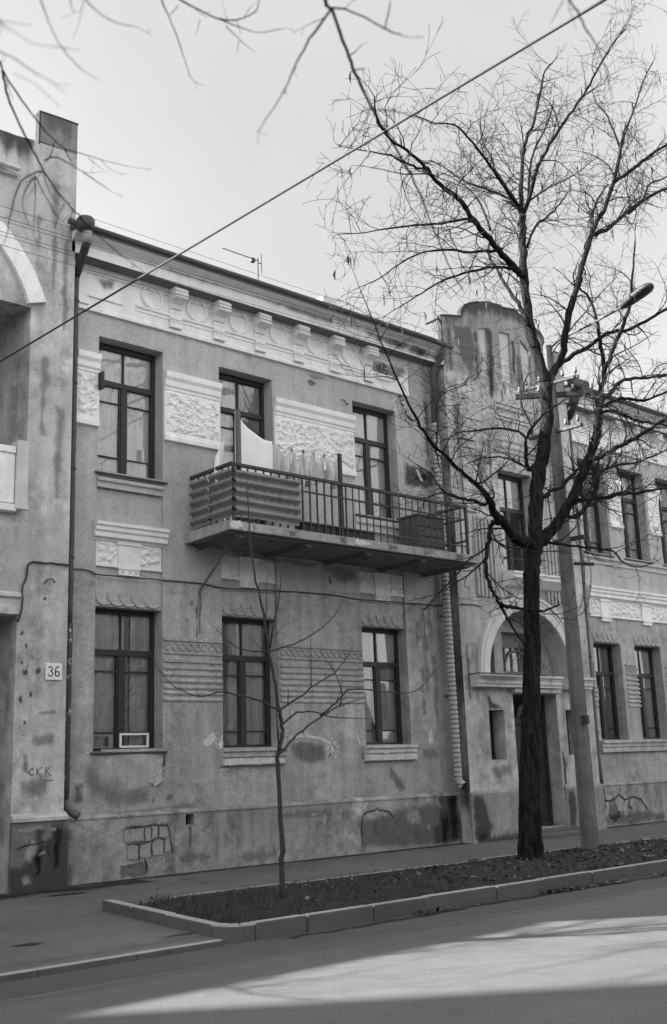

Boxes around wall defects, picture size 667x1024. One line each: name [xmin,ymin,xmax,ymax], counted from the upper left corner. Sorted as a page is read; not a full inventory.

leakage [0,129,33,153]
flaking render [288,734,340,759]
crack [604,790,648,813]
leakage [9,824,71,895]
flaking render [119,825,171,878]